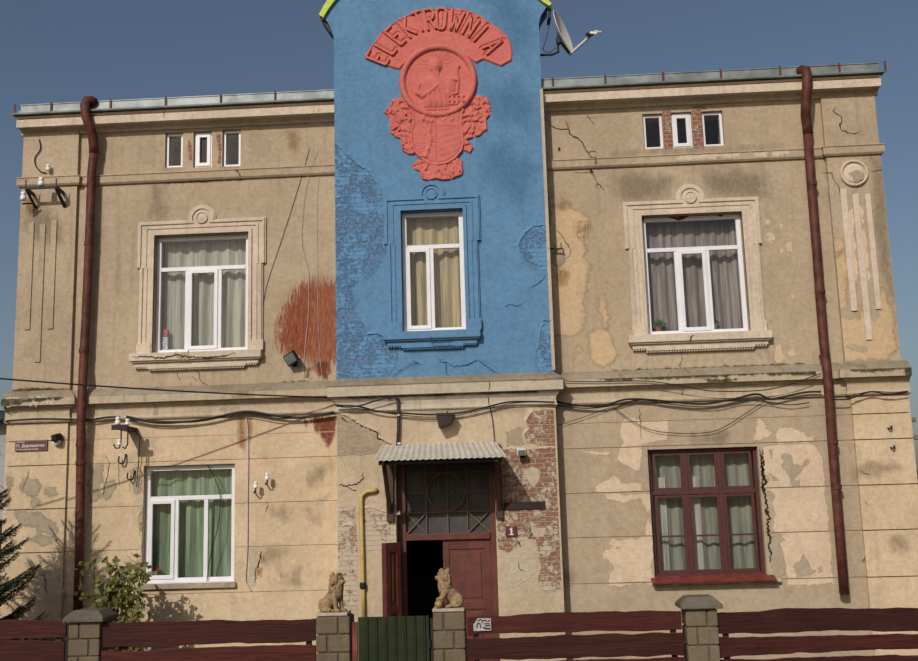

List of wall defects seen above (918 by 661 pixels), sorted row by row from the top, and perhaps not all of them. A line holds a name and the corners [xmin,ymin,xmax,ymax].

crack [544,114,604,190]
crack [830,105,863,137]
rust [275,281,336,378]
spalling [335,141,398,378]
crack [391,336,499,389]
peeling [514,201,617,371]
rust [304,416,336,446]
spalling [497,407,561,592]
peeling [595,476,654,587]
peeling [582,417,669,471]
crack [759,449,772,562]
peeling [753,418,834,586]